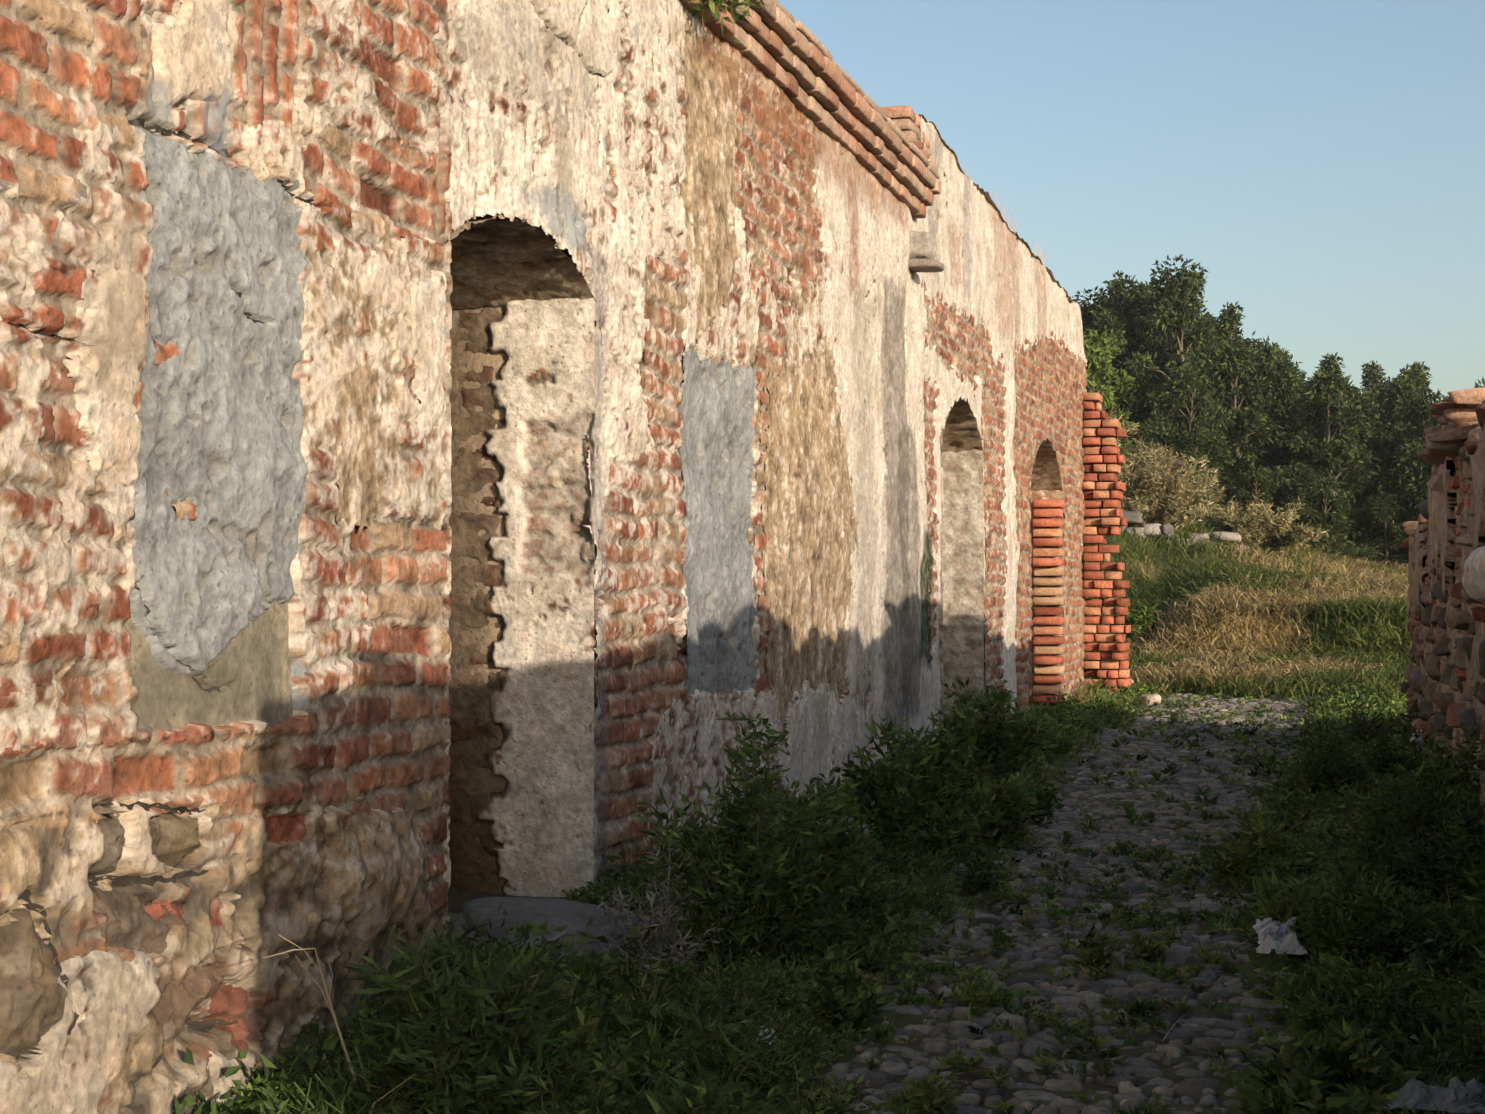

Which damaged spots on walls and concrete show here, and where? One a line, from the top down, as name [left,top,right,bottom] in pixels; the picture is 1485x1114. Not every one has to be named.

crack [128,118,231,158]
spalling [0,0,455,245]
crack [277,178,316,207]
crack [2,319,97,346]
spalling [594,10,868,883]
spalling [921,282,1087,712]
crack [0,889,80,1036]
flaking render [0,948,161,1114]
spalling [201,980,251,1114]